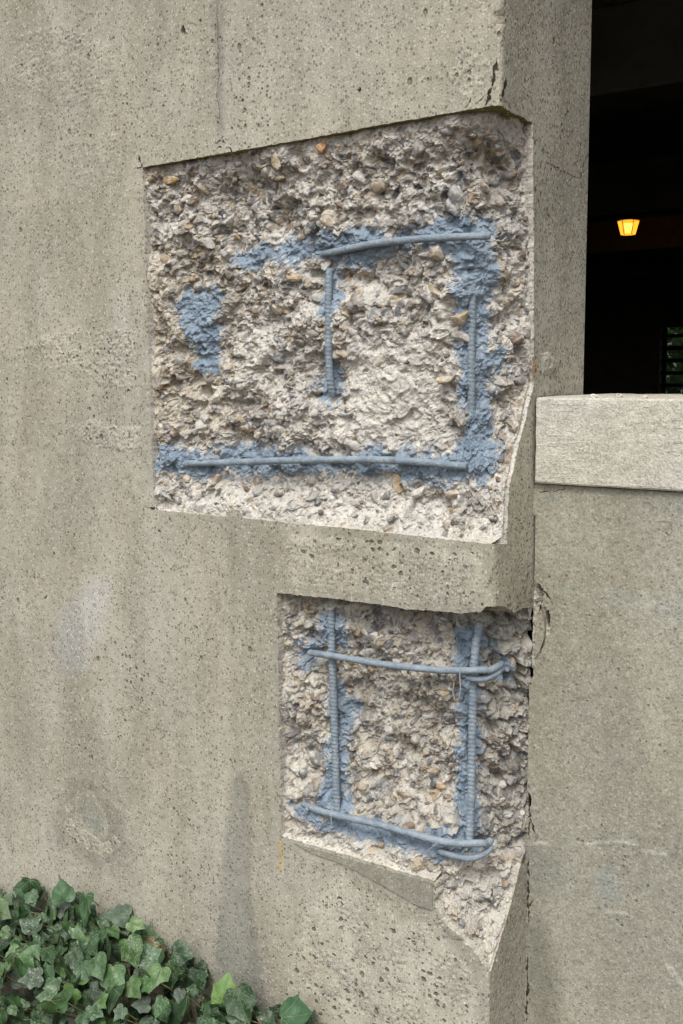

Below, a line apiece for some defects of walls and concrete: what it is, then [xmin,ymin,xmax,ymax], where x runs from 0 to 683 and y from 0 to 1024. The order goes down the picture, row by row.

crack [465,58,507,107]
spalling [16,49,559,1024]
crack [535,580,553,616]
crack [528,800,537,836]
crack [526,861,534,927]
crack [523,956,531,1021]